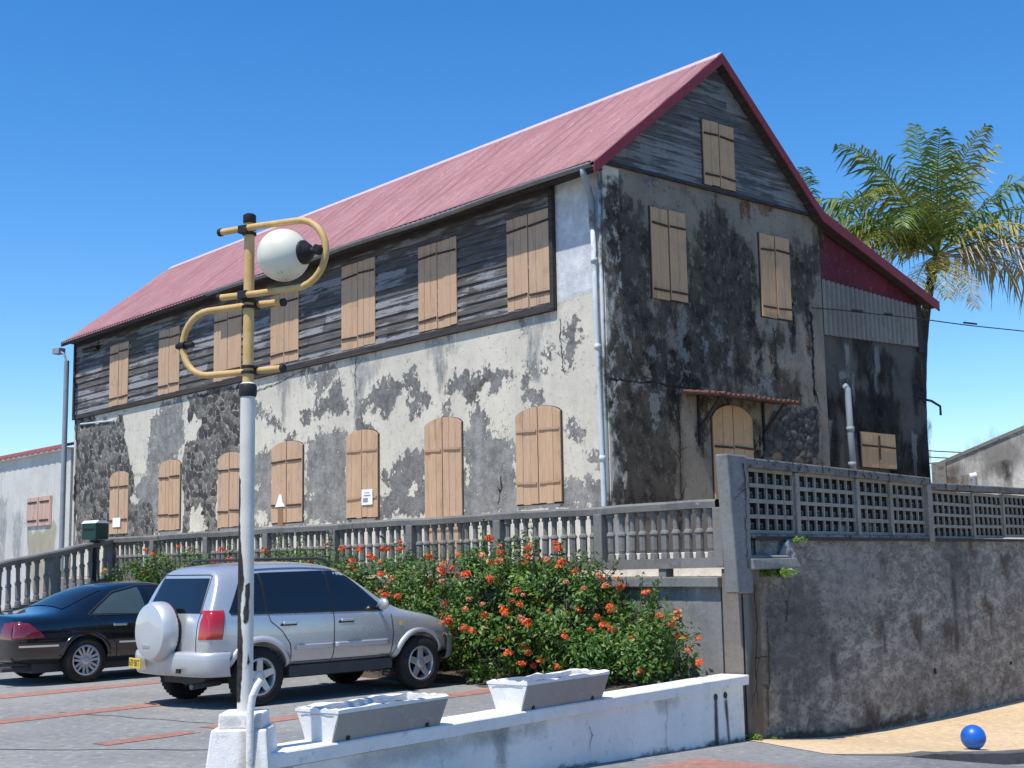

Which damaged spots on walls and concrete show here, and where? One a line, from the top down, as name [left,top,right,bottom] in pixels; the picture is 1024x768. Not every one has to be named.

spalling [72,383,240,552]
peeling [254,314,585,528]
peeling [559,416,610,519]
damp [589,177,826,549]
damp [804,339,931,478]
damp [913,309,927,412]
crack [734,463,788,717]